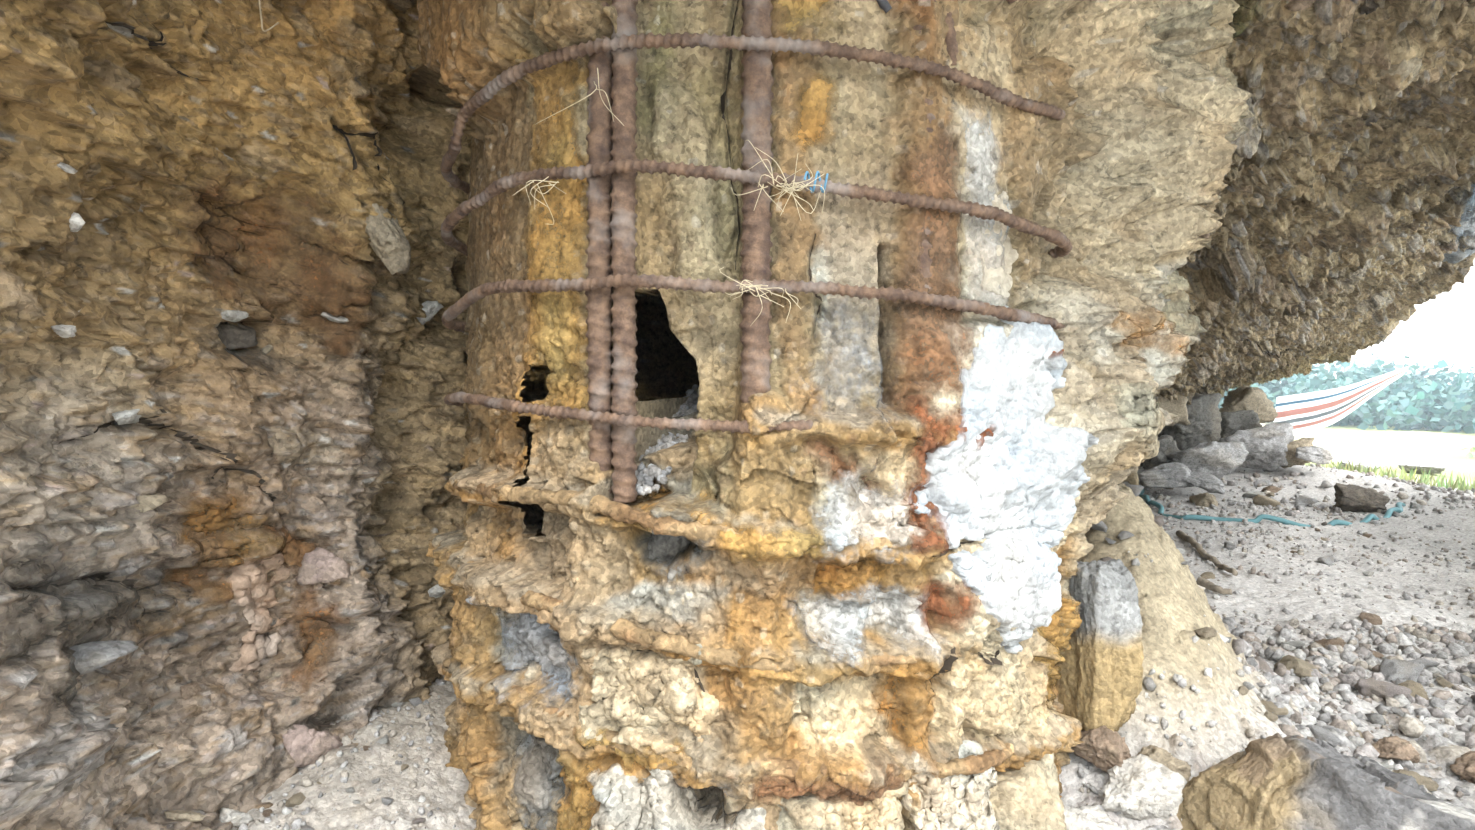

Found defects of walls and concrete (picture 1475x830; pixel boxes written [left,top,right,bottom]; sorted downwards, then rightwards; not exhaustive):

corrosion [777,0,830,32]
corrosion [795,78,834,144]
corrosion [527,90,589,409]
corrosion [885,134,994,552]
peeling [908,191,1099,654]
spalling [806,439,878,495]
spalling [645,530,704,581]
spalling [502,613,572,693]
spalling [804,585,940,658]
corrosion [920,583,978,625]
spalling [513,734,566,830]